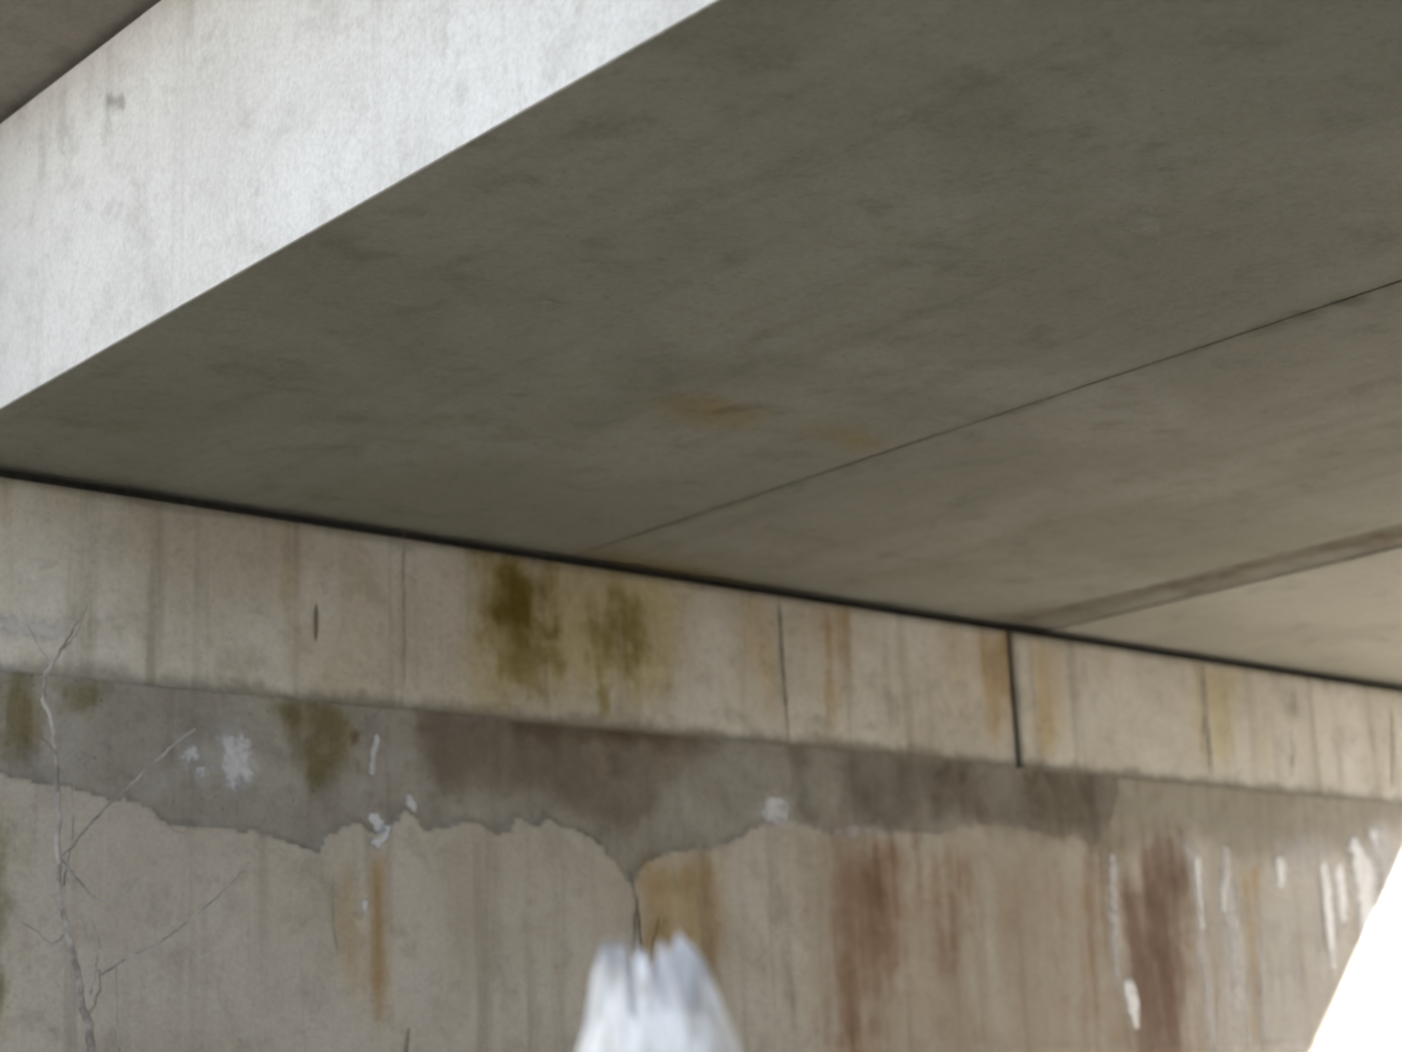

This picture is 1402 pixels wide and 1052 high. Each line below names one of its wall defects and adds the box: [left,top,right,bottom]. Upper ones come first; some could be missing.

damp [181,732,254,791]
damp [369,734,380,775]
damp [406,794,417,813]
damp [368,813,391,848]
crack [628,866,659,963]
damp [1194,855,1205,930]
damp [1276,857,1287,892]
damp [1319,826,1384,1052]
damp [1124,977,1140,1030]